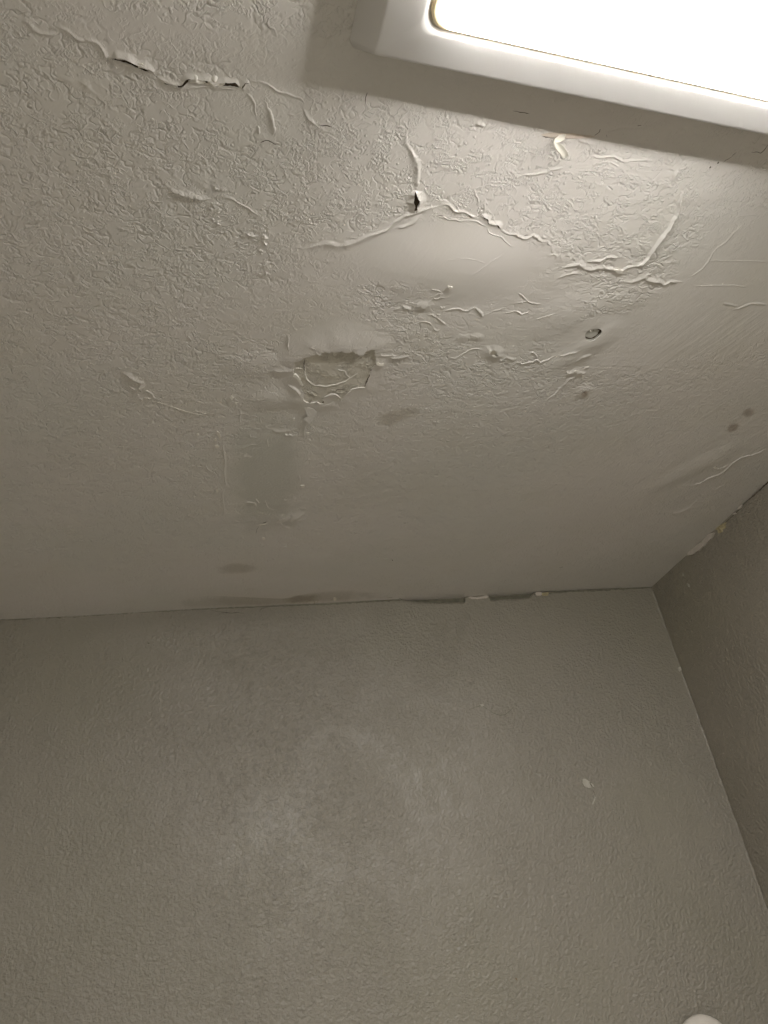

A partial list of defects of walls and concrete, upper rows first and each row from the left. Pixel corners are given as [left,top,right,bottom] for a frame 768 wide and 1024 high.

crack [21,17,251,100]
crack [301,130,758,286]
peeling [270,319,409,437]